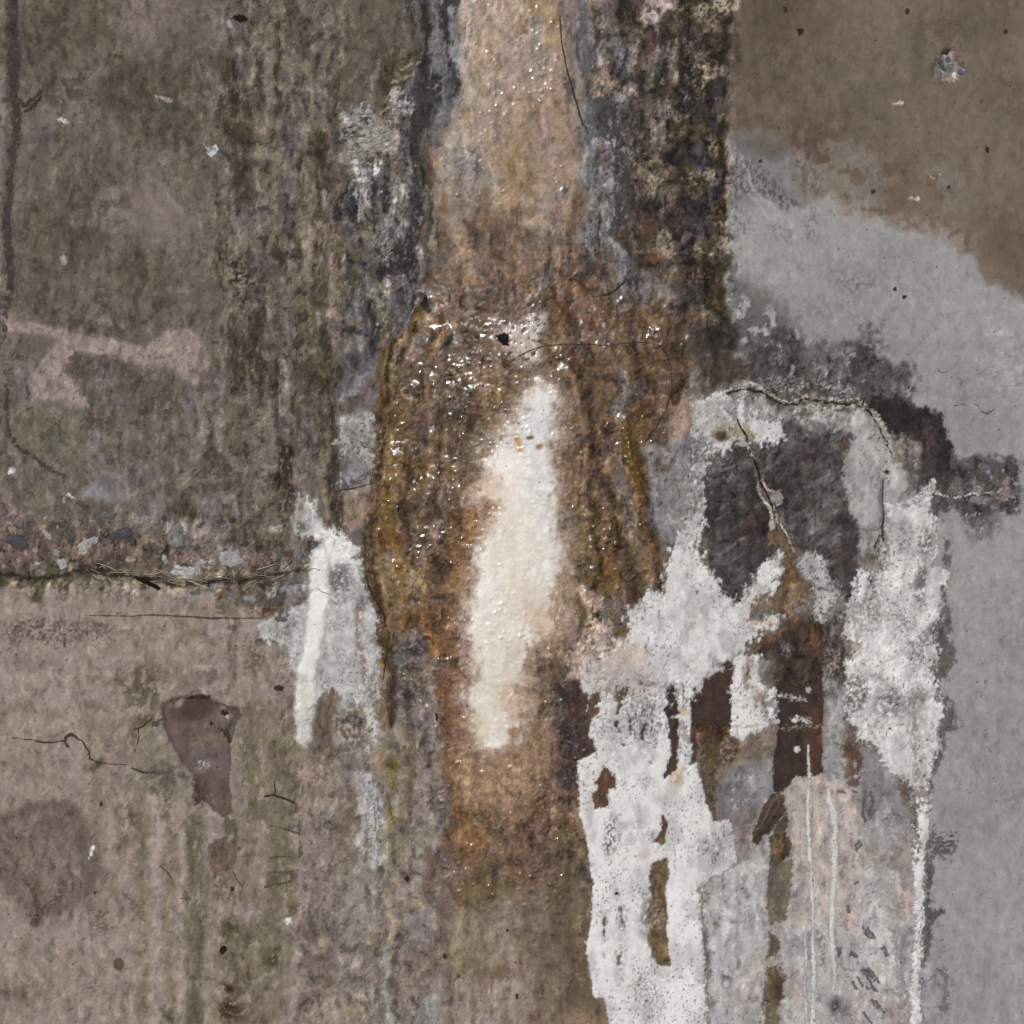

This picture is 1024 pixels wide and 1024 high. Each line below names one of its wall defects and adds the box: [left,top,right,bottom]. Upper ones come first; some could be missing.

crack [723,380,1017,553]
efflorescence [255,493,382,750]
crack [12,718,155,774]
spalling [151,690,241,817]
rust [407,500,492,861]
peeling [775,683,811,702]
peeling [777,715,822,731]
peeling [208,838,241,879]
efflorescence [356,768,387,871]
peeling [752,792,792,863]